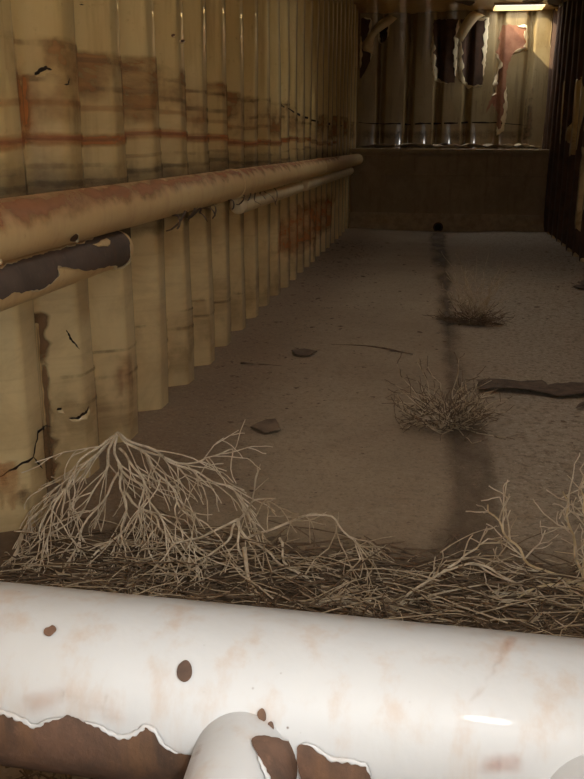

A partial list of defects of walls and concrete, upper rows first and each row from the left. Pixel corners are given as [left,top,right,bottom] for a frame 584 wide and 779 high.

peeling [430,1,528,136]
rust [0,76,126,149]
rust [152,130,337,145]
peeling [522,0,584,261]
peeling [0,231,131,300]
crack [0,407,90,477]
peeling [0,709,192,779]
peeling [251,708,371,779]